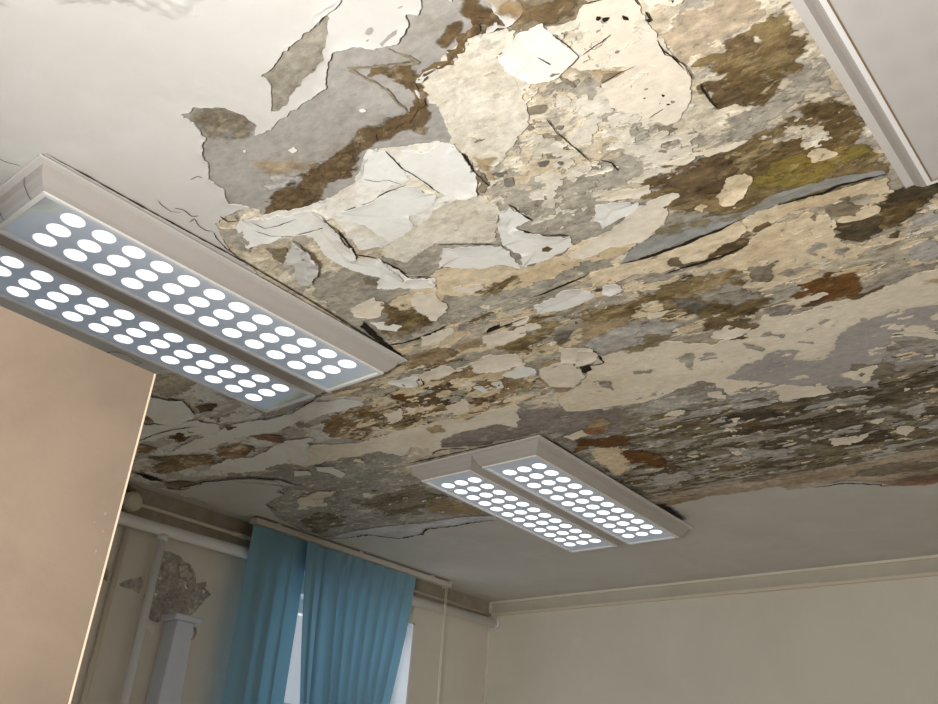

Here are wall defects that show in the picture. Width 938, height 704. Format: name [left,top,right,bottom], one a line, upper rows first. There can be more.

water stain [640,2,890,228]
crack [386,325,447,346]
peeling [126,0,938,539]
crack [533,174,894,297]
water stain [578,239,938,354]
water stain [831,182,938,242]
peeling [119,551,211,635]